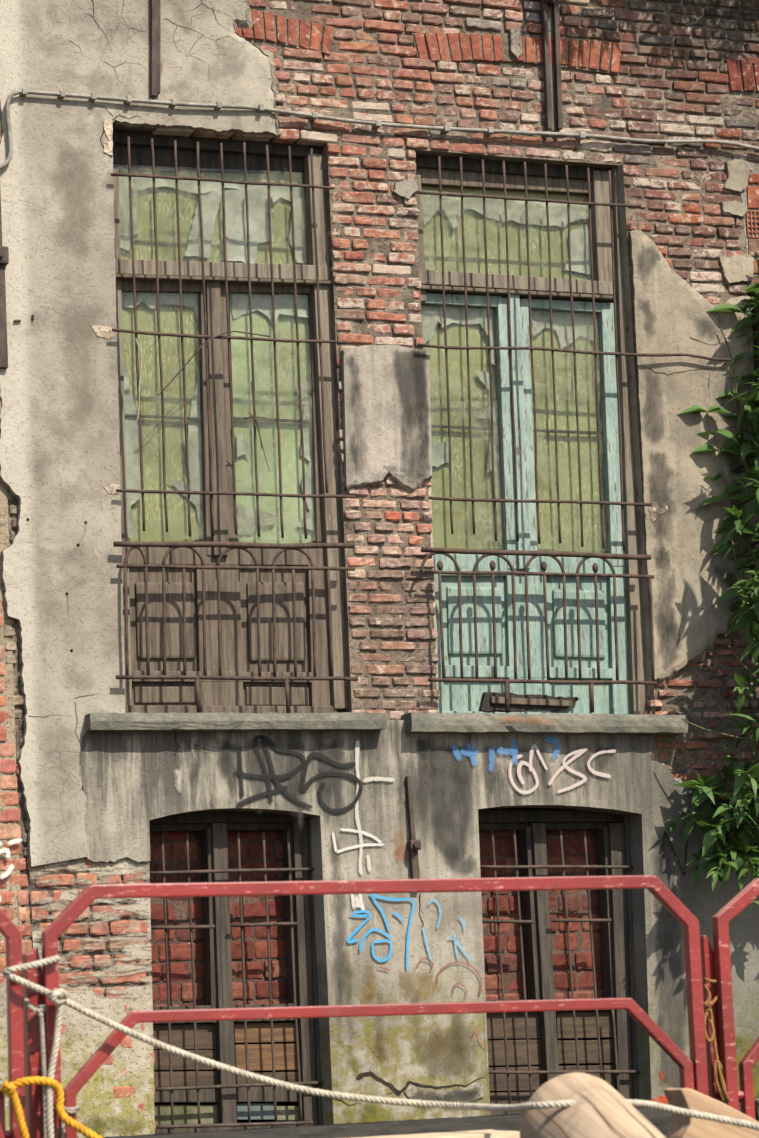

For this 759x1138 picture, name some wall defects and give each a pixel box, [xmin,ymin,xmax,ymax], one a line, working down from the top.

spalling [234,2,253,37]
crack [71,0,237,89]
spalling [508,26,522,59]
crack [97,105,140,148]
damp [396,351,428,478]
crack [333,1069,486,1106]
damp [412,1088,479,1103]